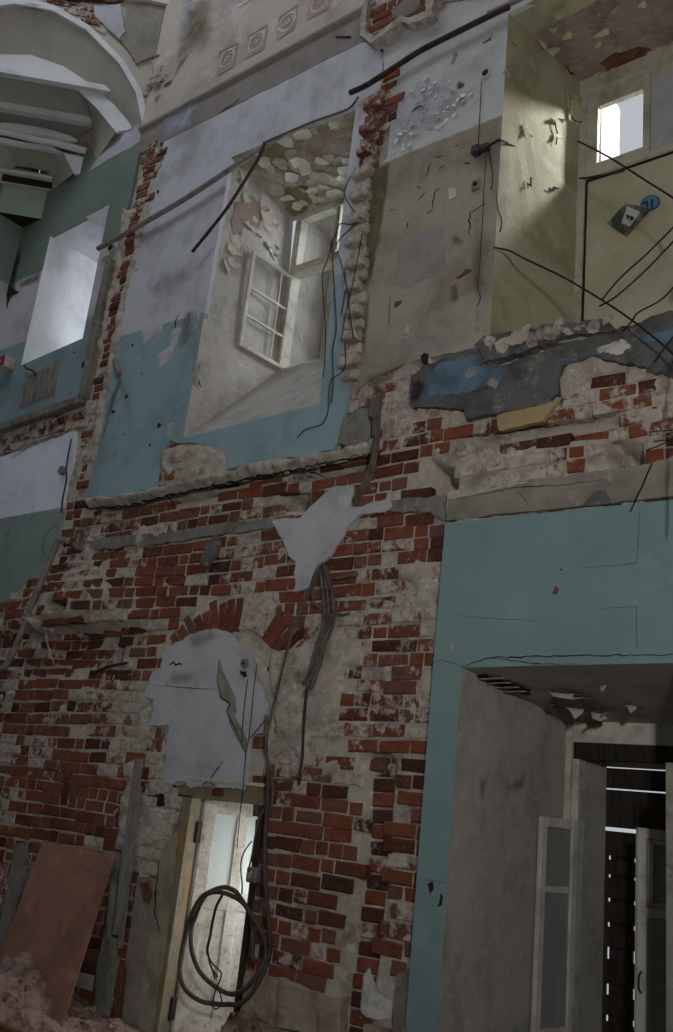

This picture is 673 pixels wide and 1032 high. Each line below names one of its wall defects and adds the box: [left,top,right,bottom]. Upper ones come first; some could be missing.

flaking render [44,0,171,103]
flaking render [360,0,445,50]
peeling [536,0,673,81]
spalling [224,68,472,383]
flaking render [0,140,182,490]
flaking render [583,490,612,506]
crack [432,606,672,667]
flaking render [217,660,265,753]
flaking render [134,780,182,876]